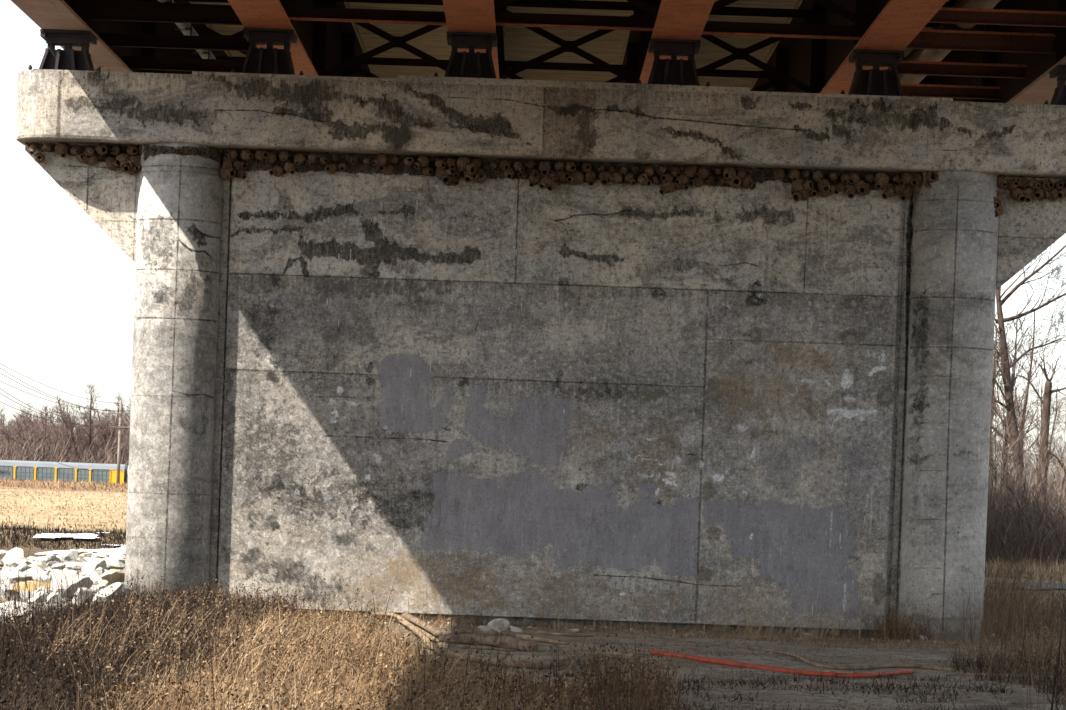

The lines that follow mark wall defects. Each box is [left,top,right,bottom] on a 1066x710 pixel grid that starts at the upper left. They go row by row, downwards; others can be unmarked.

water stain [58,66,223,134]
water stain [194,70,531,151]
water stain [657,126,743,162]
crack [594,103,830,142]
water stain [825,97,1016,147]
crack [178,223,220,257]
water stain [230,181,492,298]
water stain [558,230,625,267]
peeling [867,350,887,376]
peeling [787,369,878,428]
peeling [638,456,690,496]
water stain [222,472,348,607]